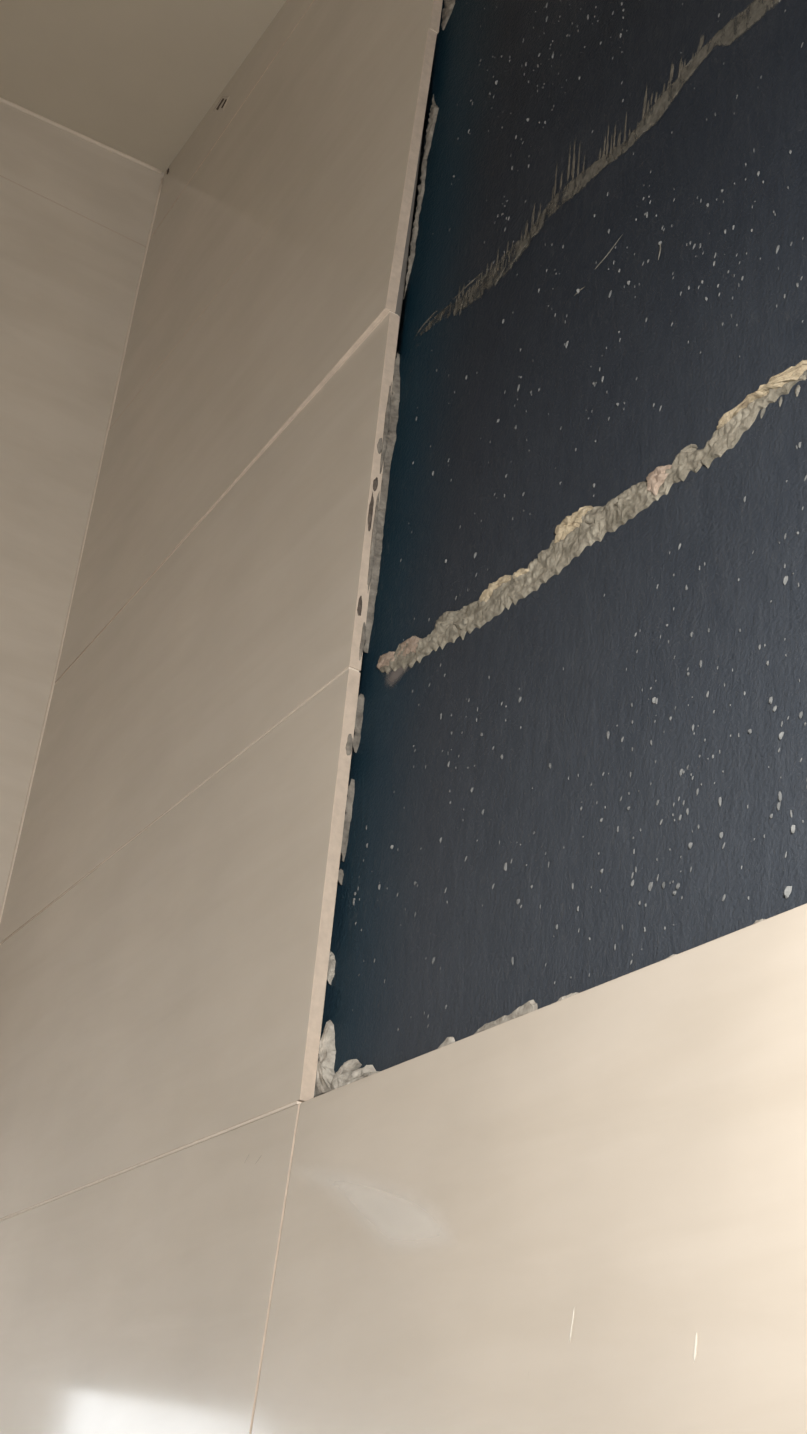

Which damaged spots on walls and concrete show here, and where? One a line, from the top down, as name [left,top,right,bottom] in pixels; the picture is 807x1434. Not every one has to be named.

peeling [314,0,807,1097]